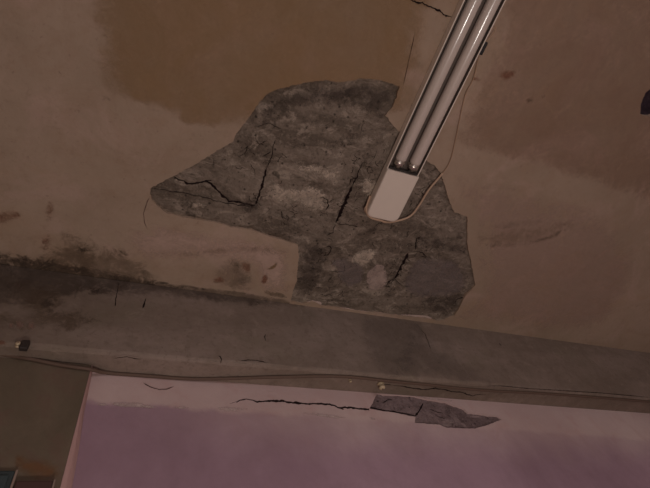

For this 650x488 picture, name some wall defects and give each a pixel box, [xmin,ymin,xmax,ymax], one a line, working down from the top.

crack [411,0,451,17]
crack [143,123,280,226]
spalling [150,78,475,320]
crack [320,161,365,273]
crack [386,237,427,287]
crack [233,384,486,419]
spalling [369,394,500,429]